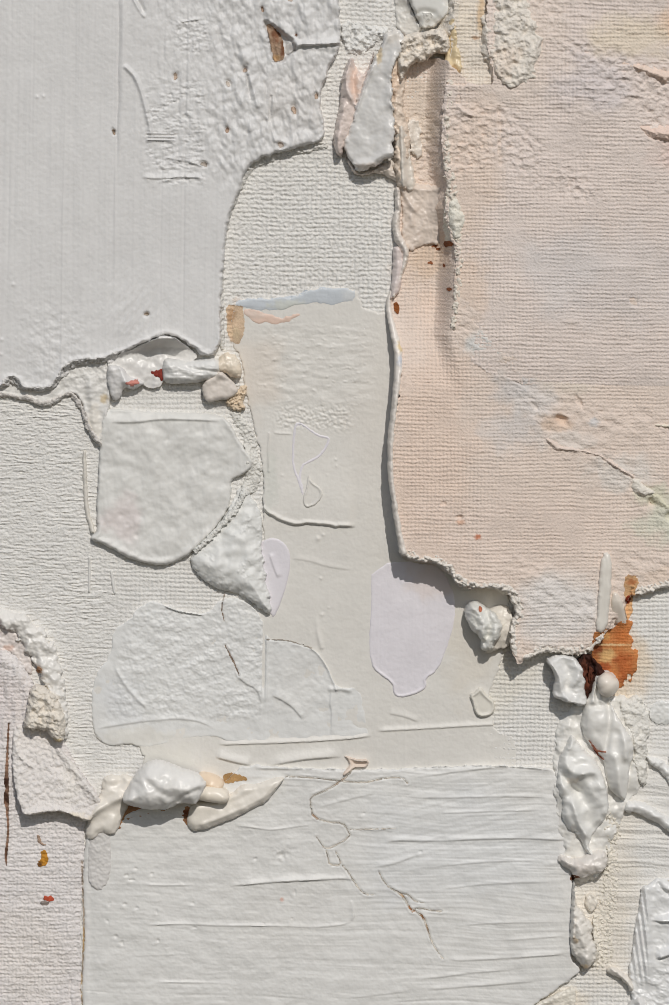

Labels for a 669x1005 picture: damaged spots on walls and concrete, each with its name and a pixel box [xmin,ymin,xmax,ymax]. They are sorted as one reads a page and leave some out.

corrosion [591,574,639,688]
crack [285,769,444,959]